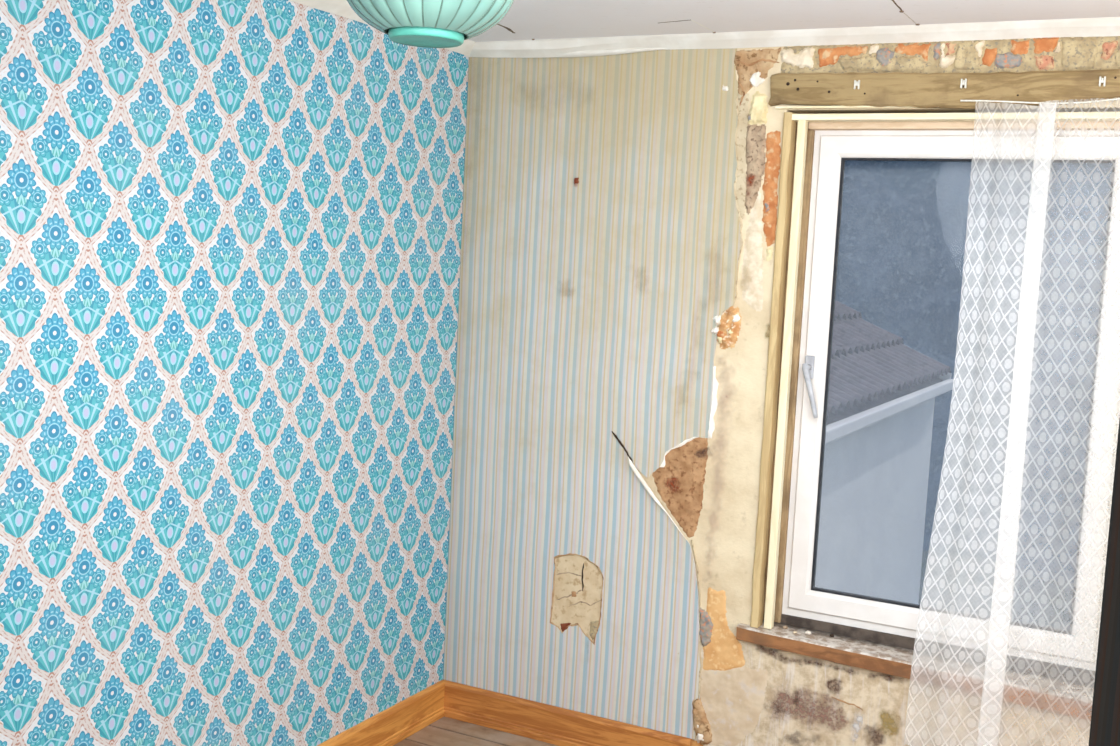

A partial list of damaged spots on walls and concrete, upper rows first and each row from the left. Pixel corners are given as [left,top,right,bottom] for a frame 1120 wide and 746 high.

flaking render [711,36,1120,350]
flaking render [652,437,708,538]
spalling [550,553,603,644]
peeling [692,587,768,746]
water stain [760,645,853,730]
water stain [868,713,898,746]